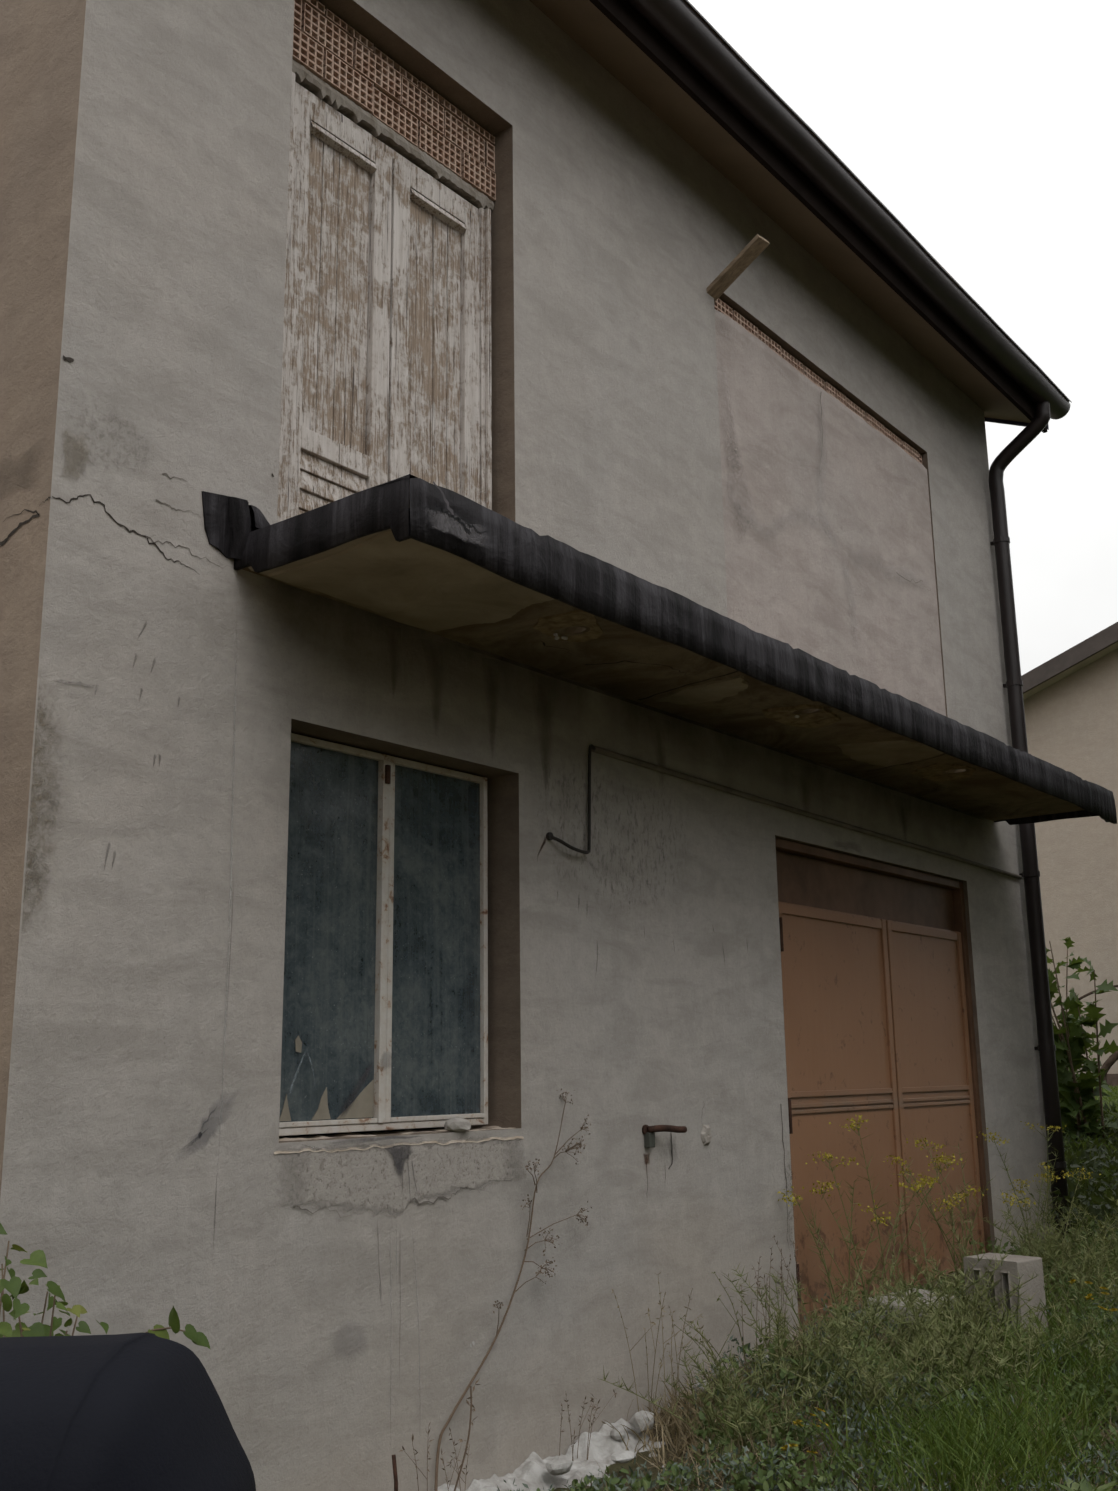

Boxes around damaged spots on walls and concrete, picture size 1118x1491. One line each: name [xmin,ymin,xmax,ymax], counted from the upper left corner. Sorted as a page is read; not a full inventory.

crack [0,473,224,575]